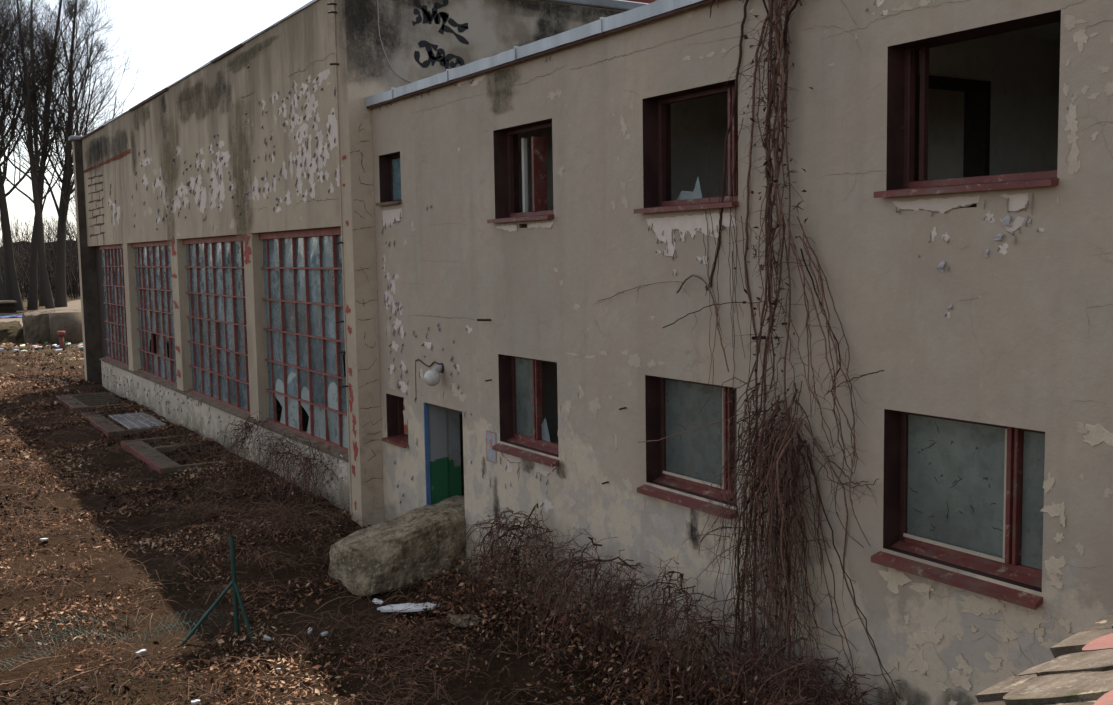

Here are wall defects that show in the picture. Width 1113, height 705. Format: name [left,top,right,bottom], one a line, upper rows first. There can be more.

peeling [1063,15,1113,66]
peeling [88,69,347,264]
peeling [1063,66,1113,175]
peeling [495,221,554,232]
peeling [647,212,737,276]
peeling [892,193,1044,257]
peeling [381,208,491,488]
peeling [500,384,613,518]
peeling [1076,421,1113,446]
peeling [878,568,934,598]
peeling [1040,473,1085,589]
peeling [894,594,1086,705]